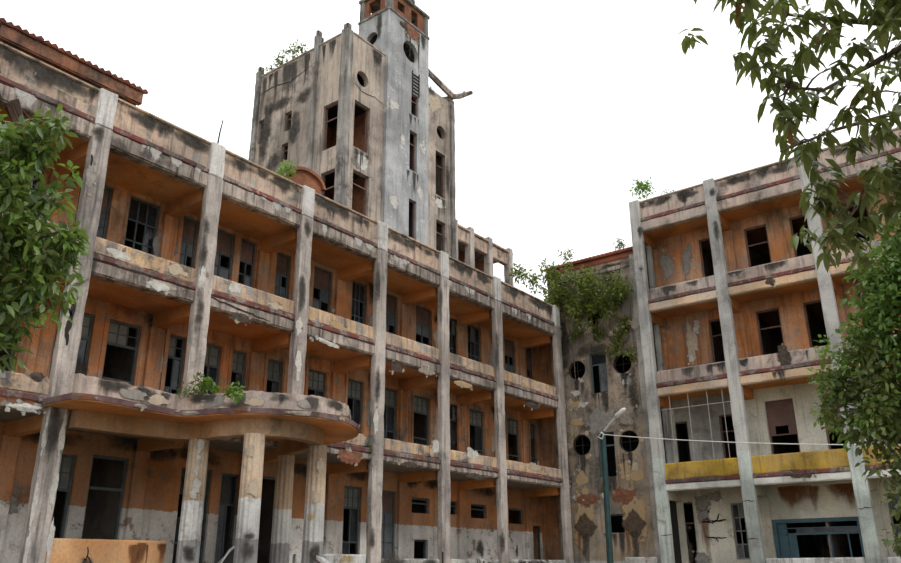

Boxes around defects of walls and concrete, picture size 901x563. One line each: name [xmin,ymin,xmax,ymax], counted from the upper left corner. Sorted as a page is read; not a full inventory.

leakage [230,53,311,192]
peeling [659,244,696,279]
crack [211,296,271,322]
peeling [685,316,700,365]
spalling [4,399,68,563]
rust [778,483,855,504]
crack [701,508,756,542]